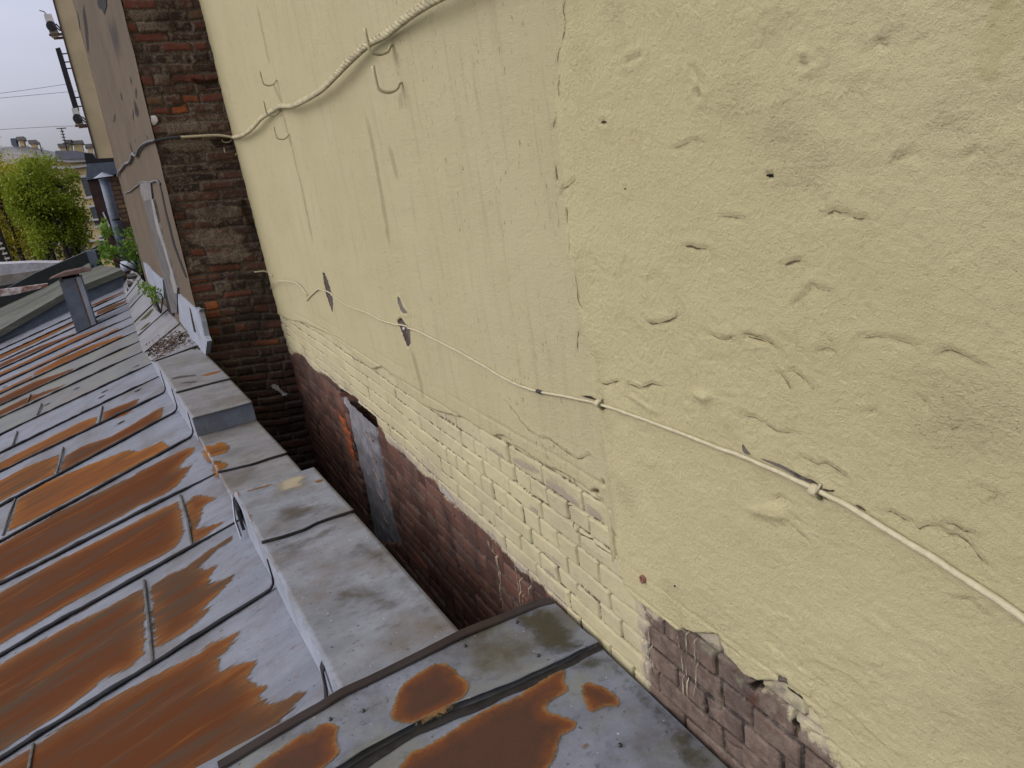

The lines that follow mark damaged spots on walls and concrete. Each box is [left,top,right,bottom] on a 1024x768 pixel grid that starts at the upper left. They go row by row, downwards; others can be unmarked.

rust [0,322,122,415]
crack [713,333,772,344]
spalling [335,408,357,460]
crack [888,511,983,561]
rust [0,399,308,768]
rust [390,663,469,725]
rust [399,670,576,768]
rust [581,682,620,712]